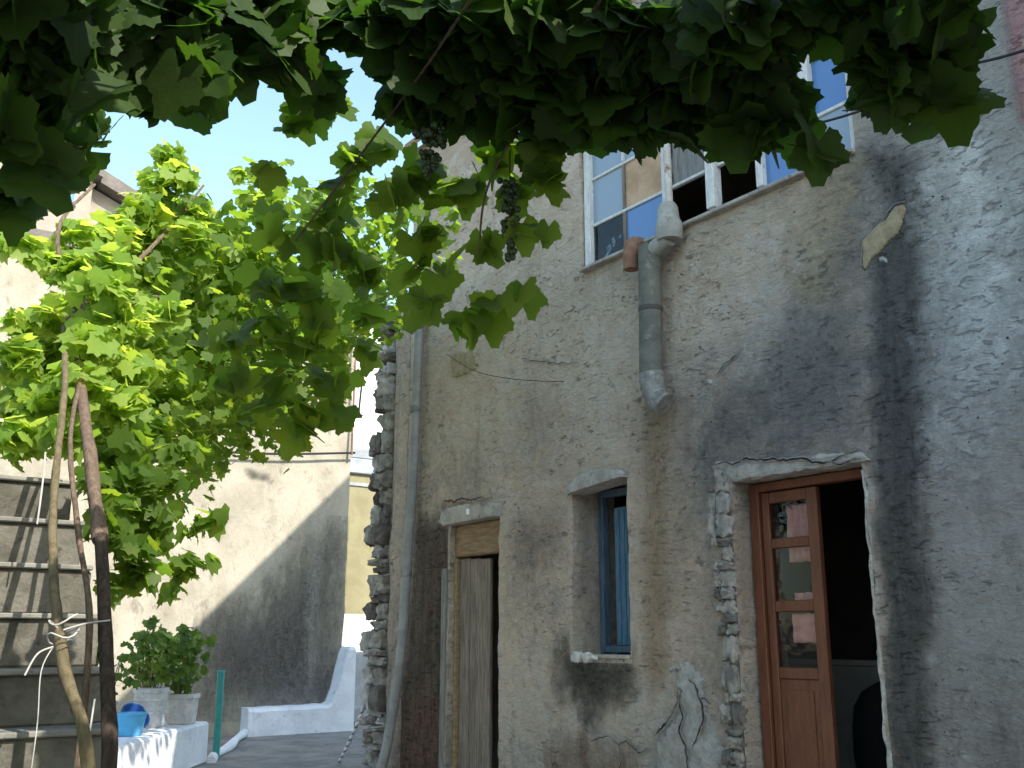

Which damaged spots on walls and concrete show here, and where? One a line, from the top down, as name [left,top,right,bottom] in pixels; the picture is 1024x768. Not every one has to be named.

peeling [860,201,906,269]
crack [714,449,861,466]
water stain [554,638,632,727]